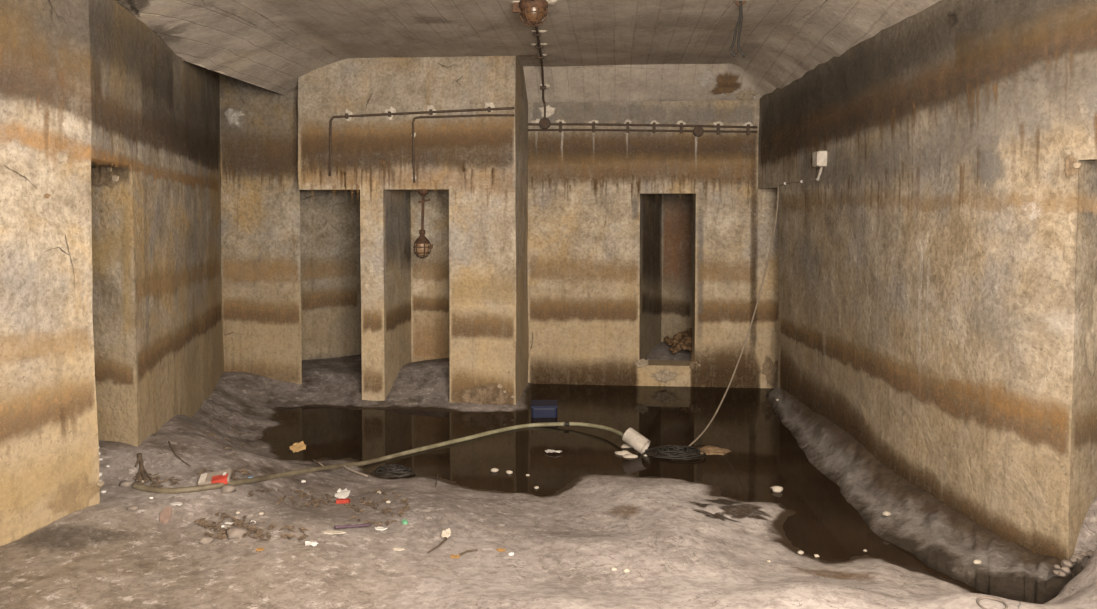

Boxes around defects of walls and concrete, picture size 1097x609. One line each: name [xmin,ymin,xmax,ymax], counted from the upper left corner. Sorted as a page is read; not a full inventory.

leakage [0,0,1097,453]
leakage [780,351,1066,561]